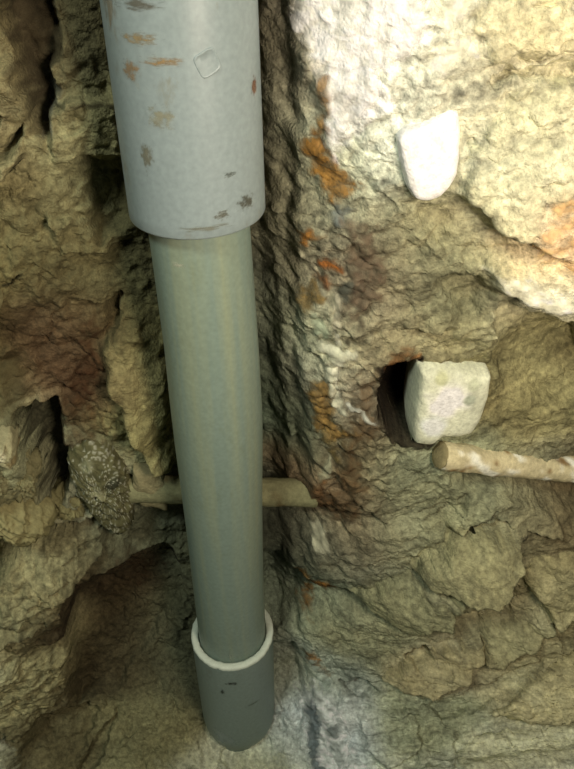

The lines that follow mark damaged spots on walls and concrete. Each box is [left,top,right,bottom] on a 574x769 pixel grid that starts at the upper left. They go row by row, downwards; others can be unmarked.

rust [317,75,329,104]
rust [303,114,355,202]
rust [298,259,340,309]
spalling [22,395,70,490]
rust [309,381,350,462]
spalling [132,462,168,511]
damp [299,660,371,769]